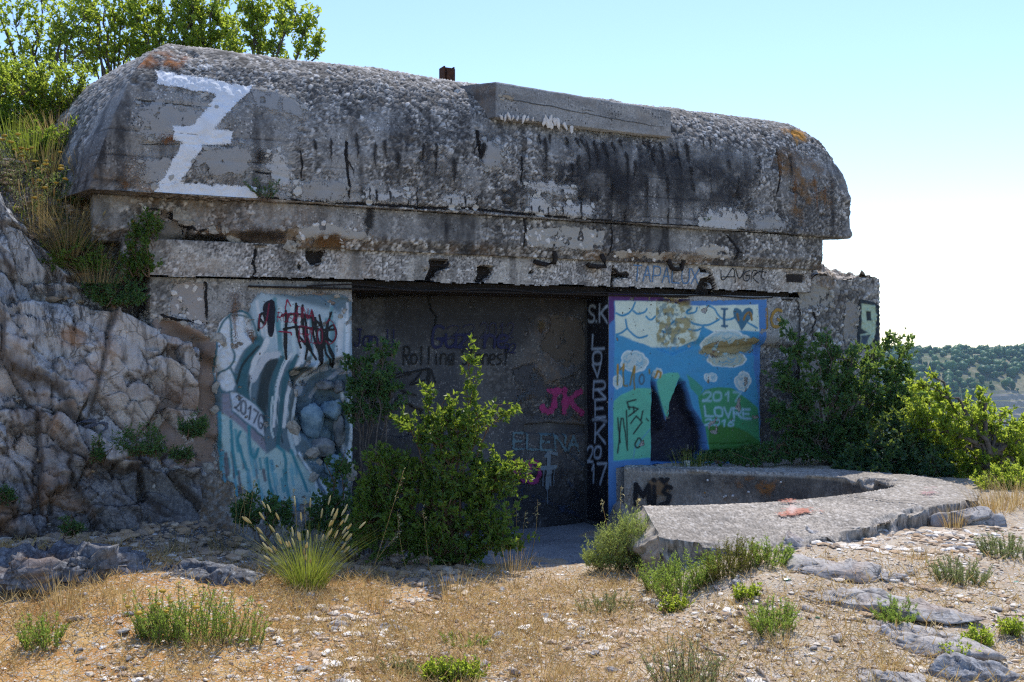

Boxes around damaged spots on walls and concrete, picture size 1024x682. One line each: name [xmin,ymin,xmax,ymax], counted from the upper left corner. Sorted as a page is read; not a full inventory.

damp [373,139,400,169]
damp [538,134,551,163]
damp [564,136,761,218]
damp [361,188,392,235]
peeling [698,207,788,232]
spalling [133,207,372,271]
spalling [523,179,744,294]
spalling [424,259,449,282]
spalling [474,265,491,284]